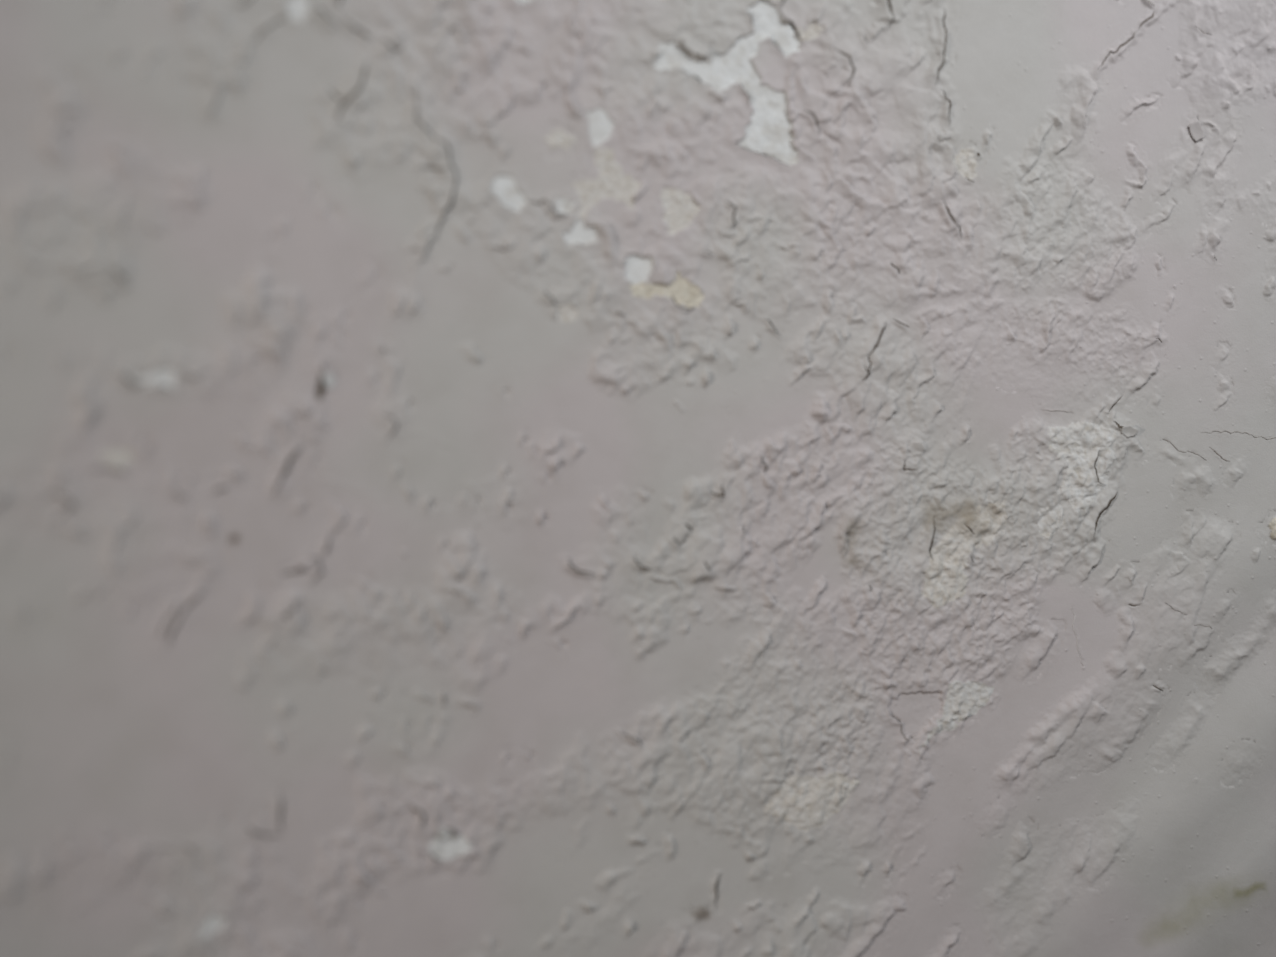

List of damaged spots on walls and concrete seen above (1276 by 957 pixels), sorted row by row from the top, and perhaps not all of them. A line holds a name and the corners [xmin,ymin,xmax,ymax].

spalling [654,0,826,166]
crack [875,0,959,138]
spalling [491,175,528,213]
spalling [543,108,642,245]
spalling [659,187,702,235]
crack [933,192,971,247]
spalling [625,255,704,308]
spalling [921,500,1008,609]
spalling [765,771,860,832]
spalling [428,826,472,861]